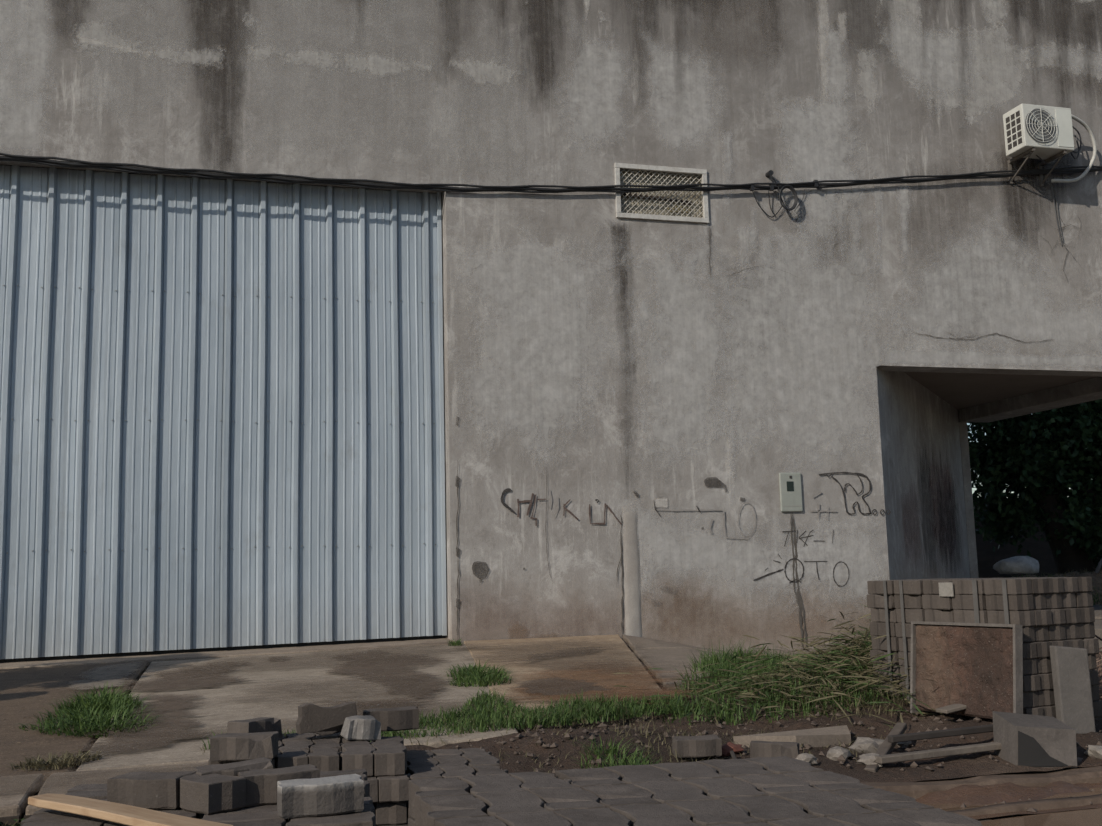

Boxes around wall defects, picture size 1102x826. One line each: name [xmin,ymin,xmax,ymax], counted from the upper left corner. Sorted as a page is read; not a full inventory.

water stain [0,0,49,149]
water stain [197,0,246,171]
water stain [463,0,1102,467]
crack [904,330,1046,343]
water stain [637,509,877,594]